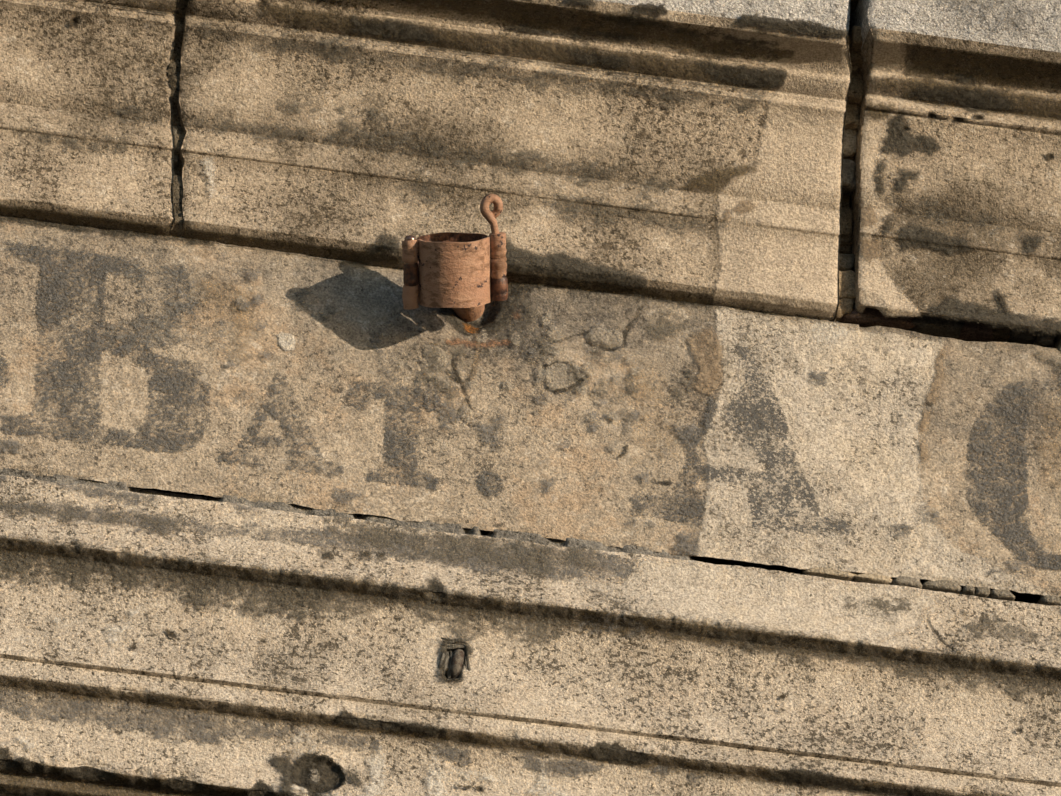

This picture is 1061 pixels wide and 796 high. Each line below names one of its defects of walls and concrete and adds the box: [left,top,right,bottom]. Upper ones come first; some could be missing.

leakage [202,157,216,197]
leakage [0,197,405,269]
crack [540,306,642,351]
leakage [259,0,1061,596]
crack [430,343,480,407]
leakage [0,482,258,536]
leakage [0,516,1061,686]